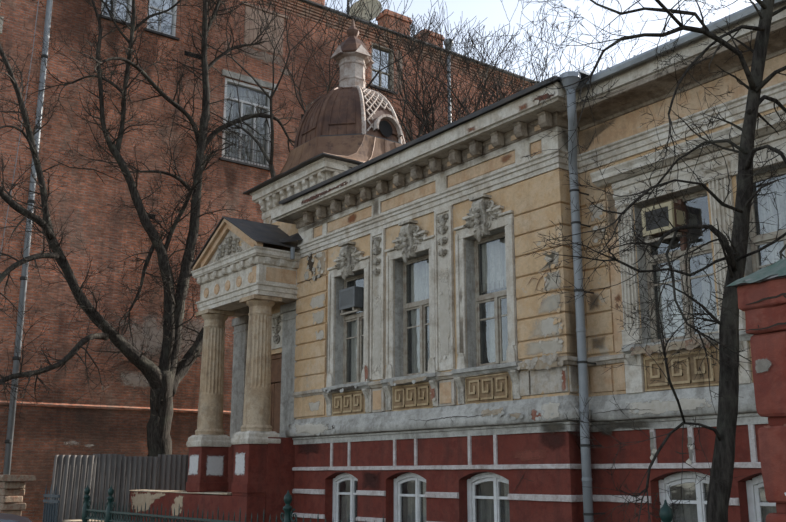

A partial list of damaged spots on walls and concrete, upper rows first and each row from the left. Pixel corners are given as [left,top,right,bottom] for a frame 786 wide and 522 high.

spalling [304,252,326,281]
crack [746,293,786,305]
flaking render [517,318,566,390]
flaking render [755,359,771,373]
flaking render [481,402,560,421]
flaking render [295,423,335,436]
peeling [131,491,165,513]
peeling [171,495,183,516]